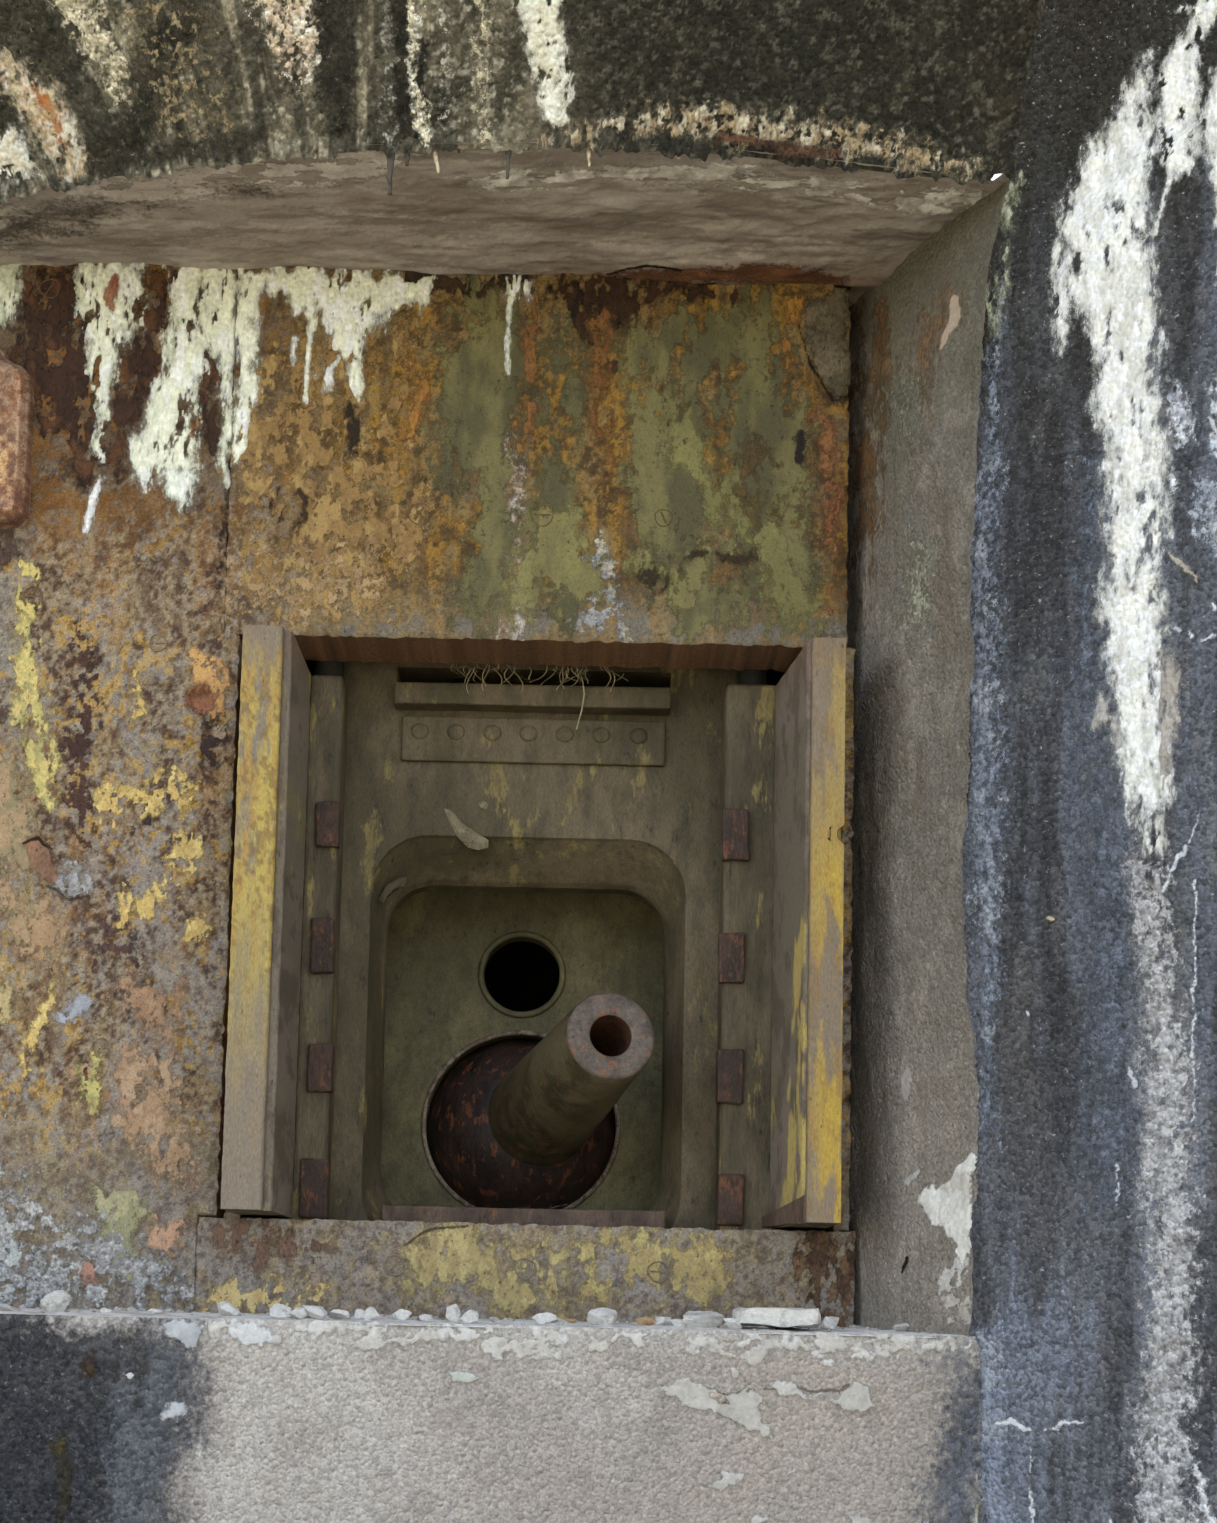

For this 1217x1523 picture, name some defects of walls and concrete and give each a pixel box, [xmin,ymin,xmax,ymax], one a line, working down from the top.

damp [0,0,269,323]
corrosion [9,267,169,489]
corrosion [197,351,231,590]
damp [74,262,435,533]
corrosion [405,271,750,486]
corrosion [49,614,104,851]
peeling [93,760,204,929]
peeling [186,646,231,723]
damp [1051,0,1217,1523]
peeling [161,1152,977,1439]
damp [0,1314,210,1523]
crack [994,1417,1084,1523]